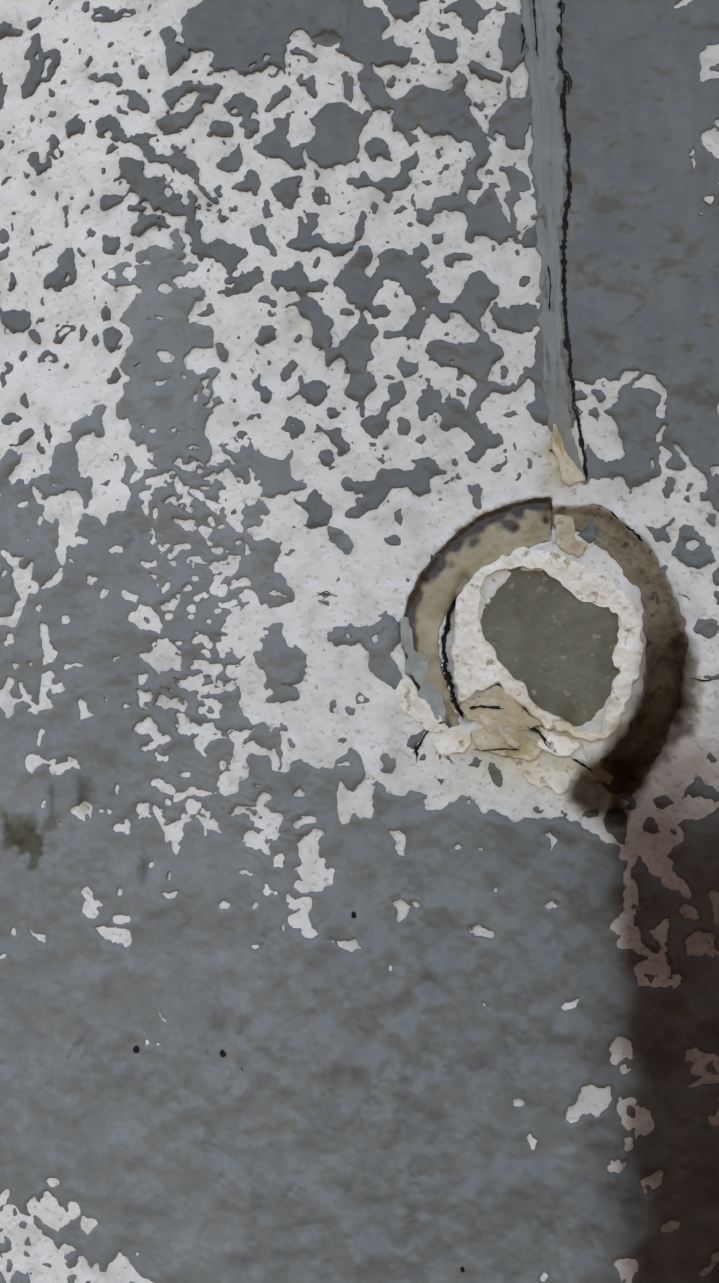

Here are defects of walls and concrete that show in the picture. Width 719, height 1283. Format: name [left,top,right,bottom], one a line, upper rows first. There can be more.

peeling [0,0,719,949]
peeling [332,938,361,952]
peeling [561,999,579,1010]
peeling [609,1036,633,1074]
peeling [566,1085,637,1173]
peeling [0,1178,154,1283]
peeling [614,1258,637,1283]